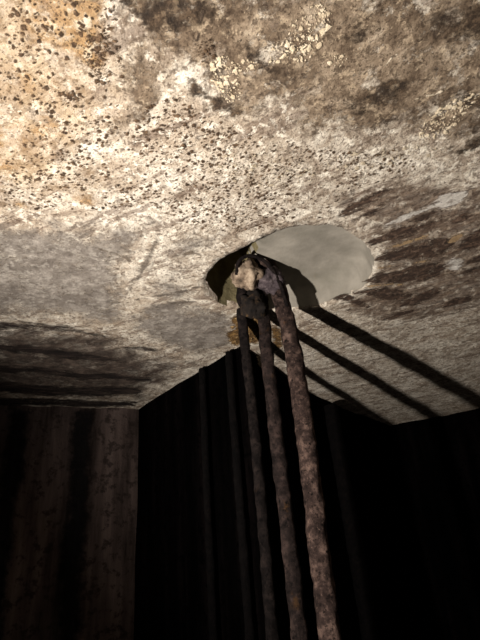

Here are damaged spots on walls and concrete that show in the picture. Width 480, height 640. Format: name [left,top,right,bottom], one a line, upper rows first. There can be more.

leakage [0,0,480,322]
peeling [338,189,388,221]
spalling [205,211,480,321]
leakage [0,321,105,337]
leakage [0,345,127,363]
leakage [133,284,234,352]